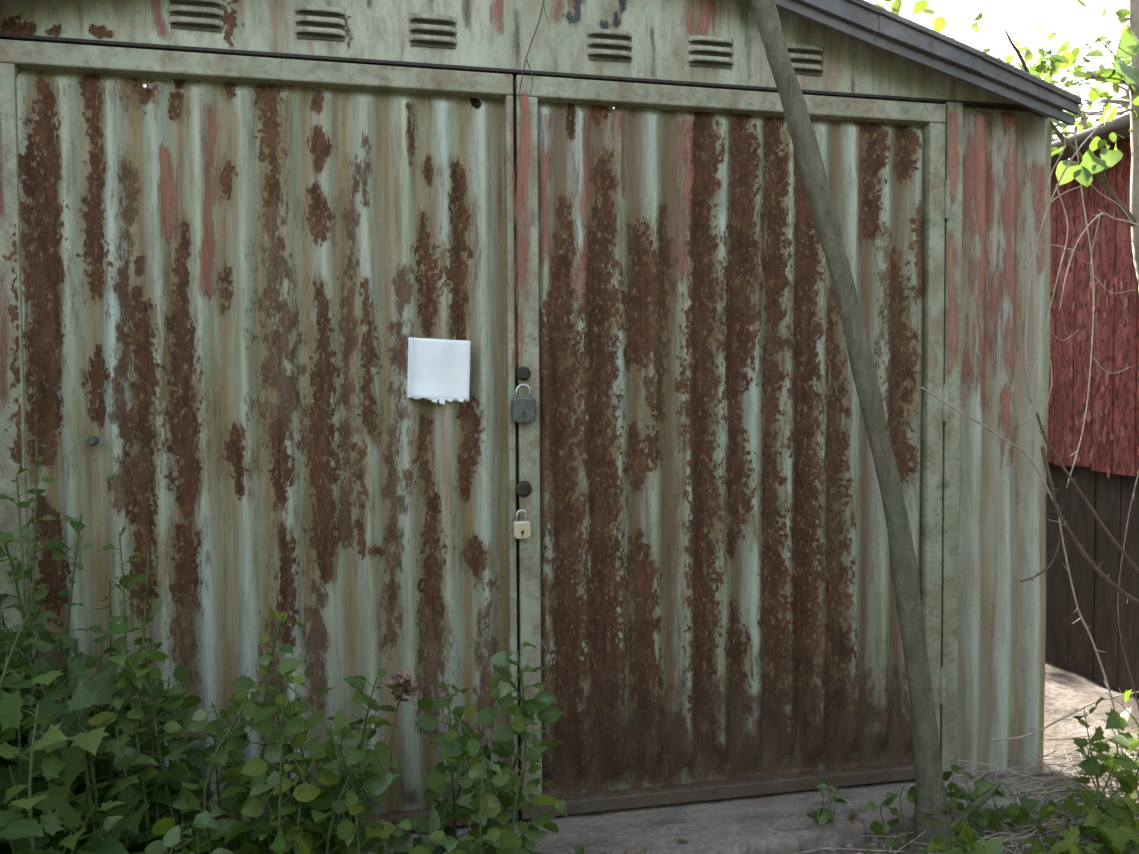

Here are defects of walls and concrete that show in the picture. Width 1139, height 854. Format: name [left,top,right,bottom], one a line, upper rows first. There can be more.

corrosion [0,13,65,37]
corrosion [88,23,114,39]
corrosion [222,0,244,48]
peeling [947,109,1046,462]
peeling [1072,277,1128,319]
corrosion [2,72,481,745]
corrosion [456,390,486,503]
corrosion [539,104,923,798]
peeling [1075,363,1128,463]
corrosion [463,534,501,745]